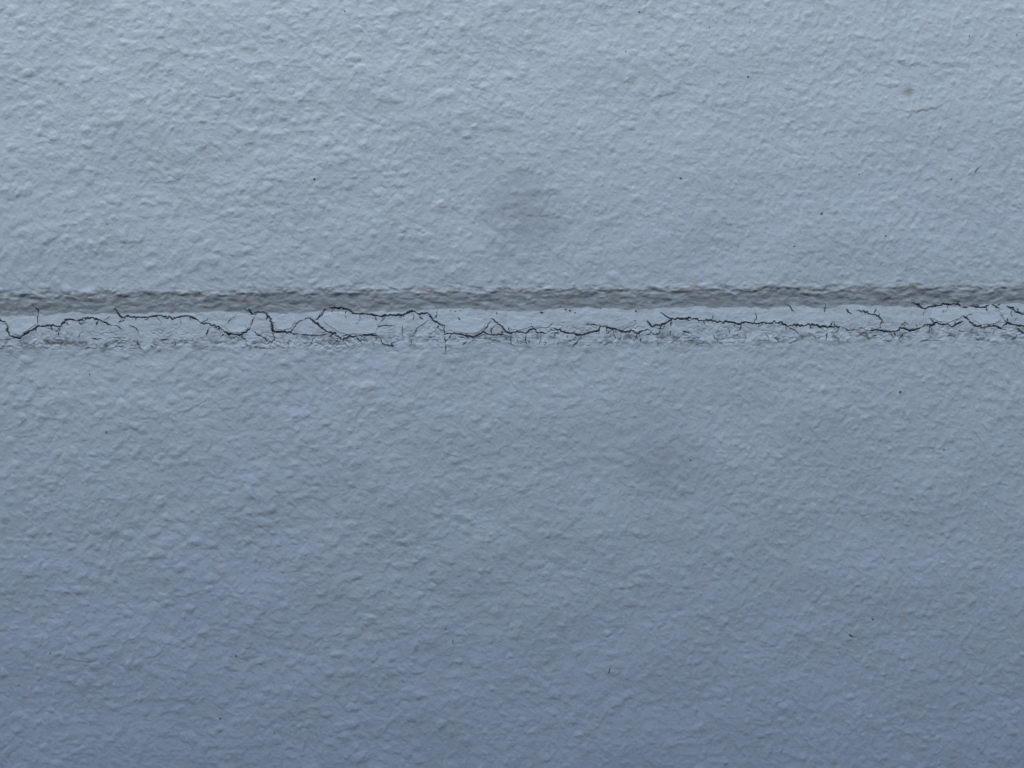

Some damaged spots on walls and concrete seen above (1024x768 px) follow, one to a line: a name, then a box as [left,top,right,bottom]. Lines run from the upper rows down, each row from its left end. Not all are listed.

crack [0,301,1024,352]